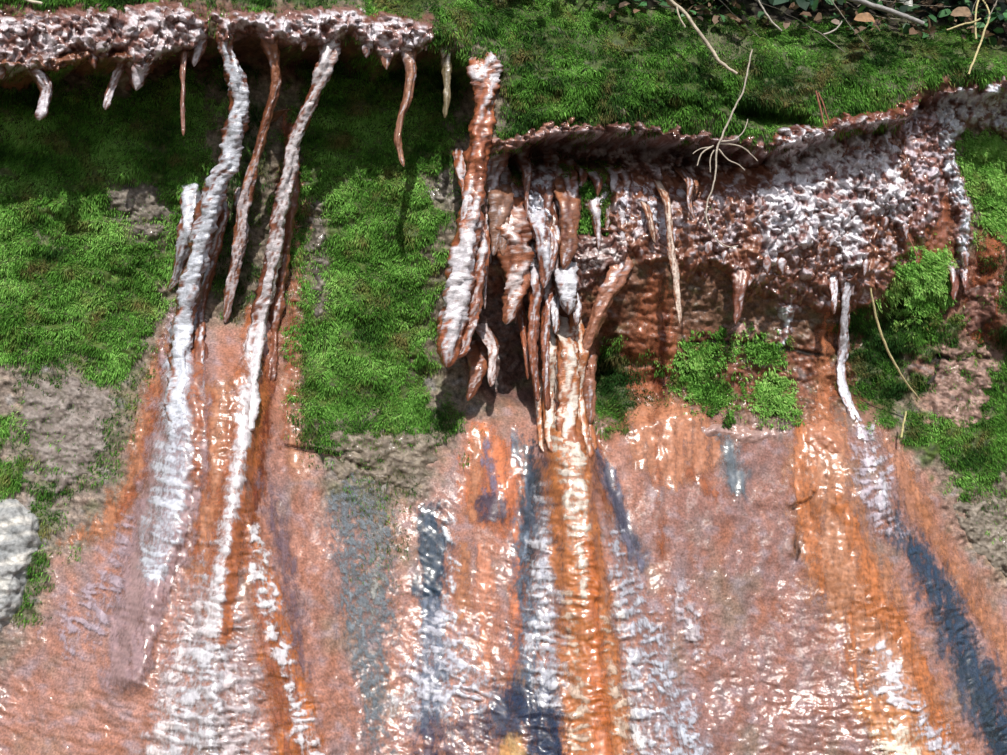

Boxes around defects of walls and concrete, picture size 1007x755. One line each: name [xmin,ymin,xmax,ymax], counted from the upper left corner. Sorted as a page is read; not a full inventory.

damp [0,0,437,92]
damp [490,75,1007,351]
rust [59,329,171,545]
damp [60,305,324,755]
rust [184,377,236,586]
rust [241,172,324,755]
rust [455,421,529,693]
damp [326,412,713,755]
rust [783,311,965,755]
damp [848,418,1007,755]
rust [881,430,1007,664]
rust [498,731,527,755]